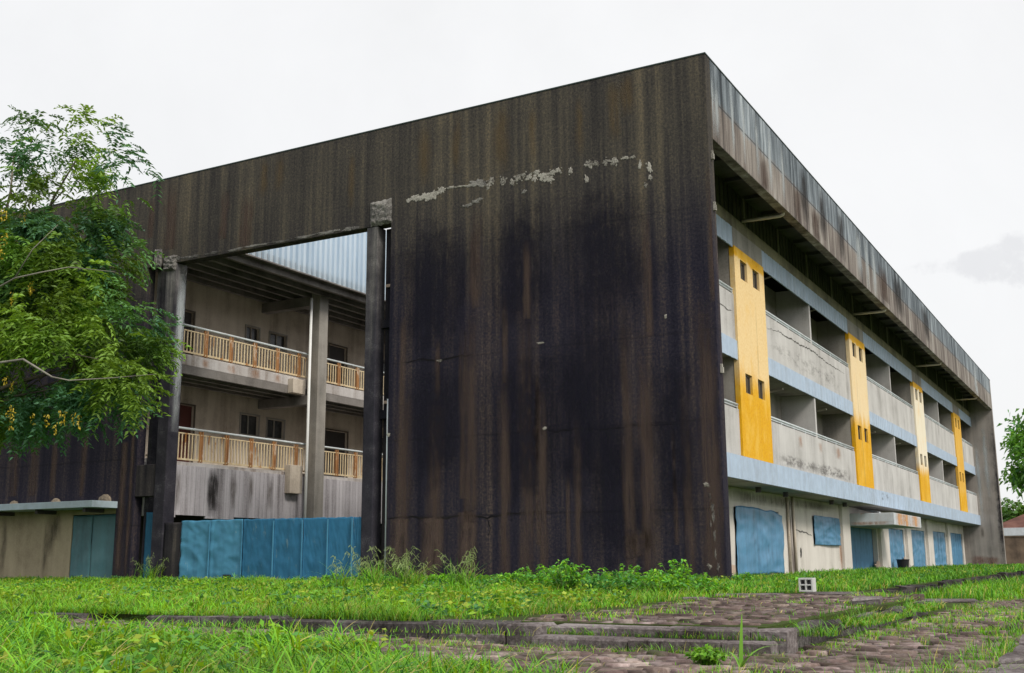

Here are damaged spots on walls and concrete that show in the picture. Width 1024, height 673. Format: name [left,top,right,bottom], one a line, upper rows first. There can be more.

leakage [731,108,784,186]
flaking render [406,155,653,208]
crack [767,328,843,373]
rust [622,360,654,572]
leakage [208,479,218,508]